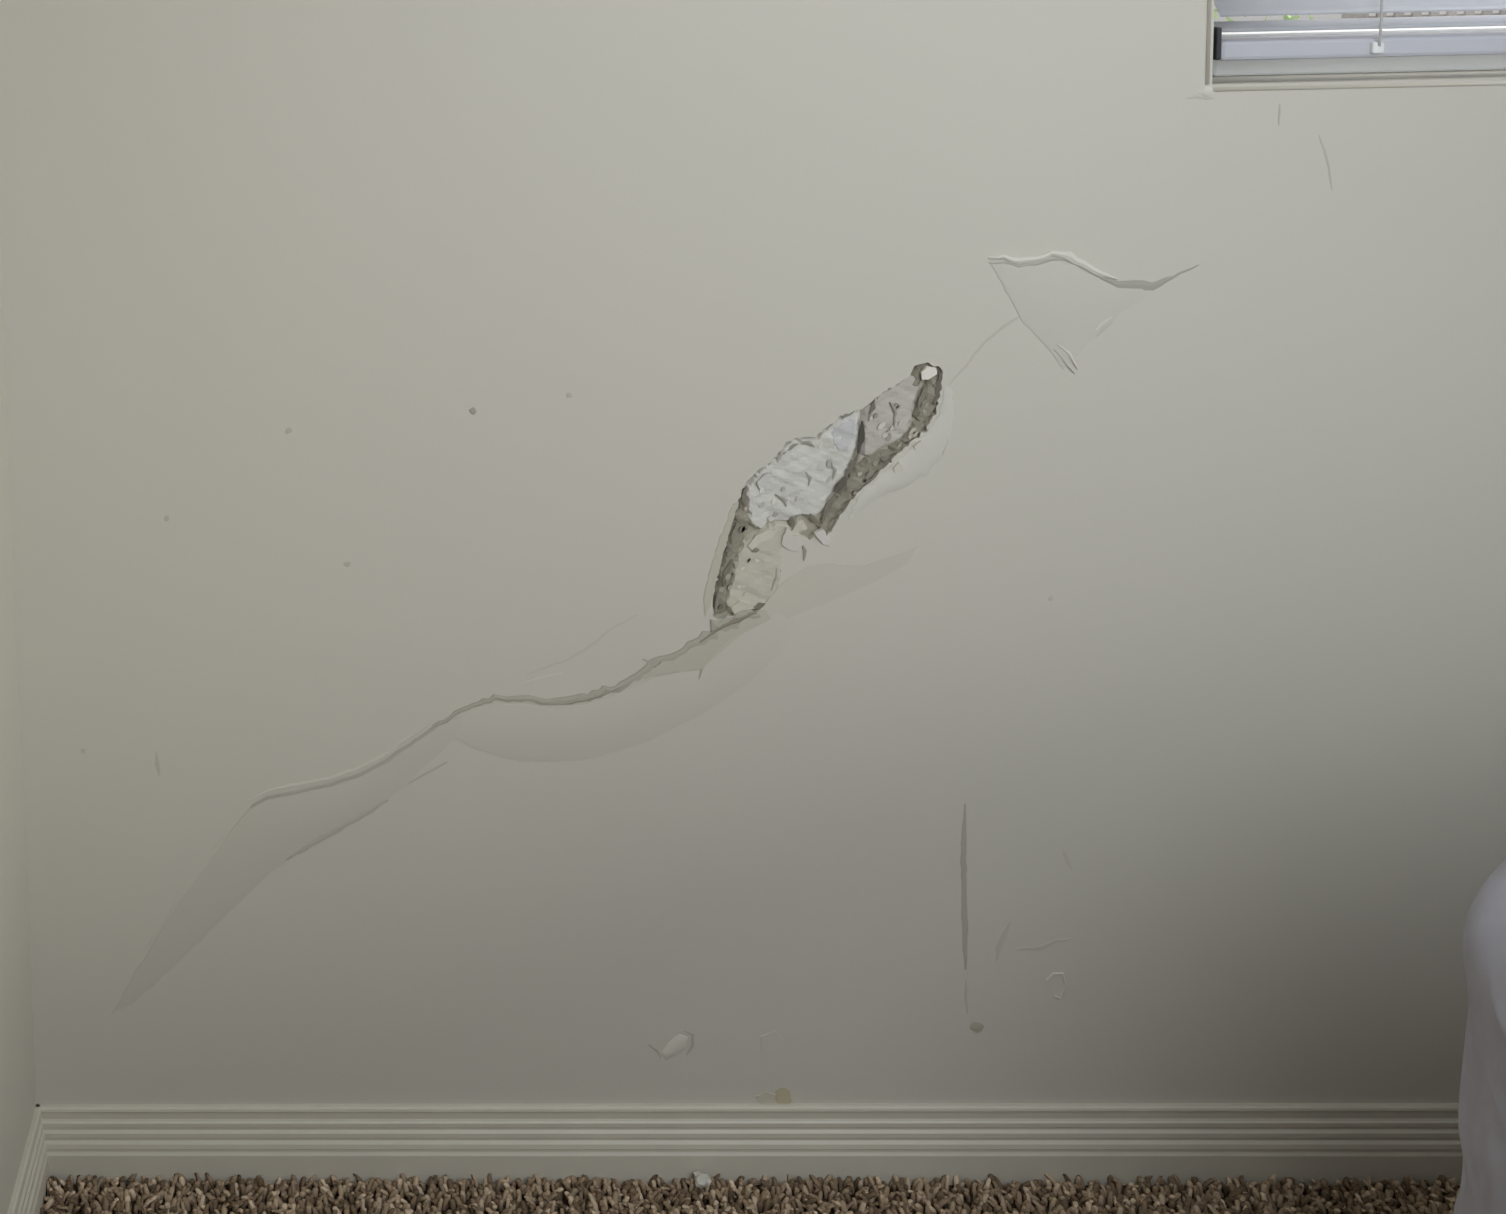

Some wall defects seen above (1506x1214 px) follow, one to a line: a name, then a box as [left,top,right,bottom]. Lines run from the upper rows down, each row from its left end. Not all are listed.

crack [988,258,1199,337]
spalling [712,362,954,617]
crack [250,611,761,861]
crack [960,804,968,1014]